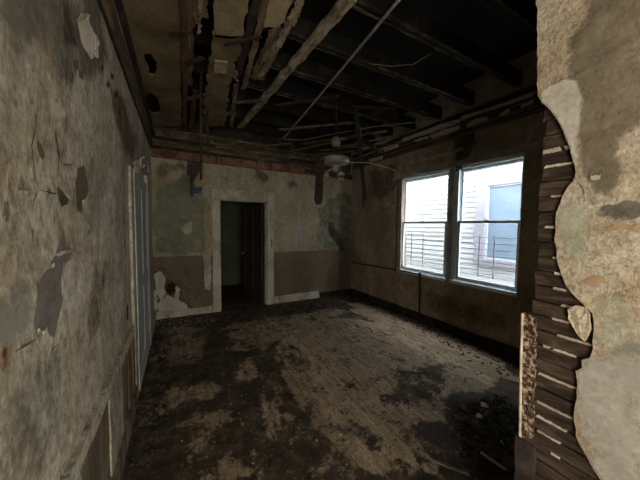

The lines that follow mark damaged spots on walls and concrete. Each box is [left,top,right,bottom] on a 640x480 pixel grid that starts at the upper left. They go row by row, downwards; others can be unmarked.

flaking render [76,13,100,59]
crack [31,110,58,206]
crack [56,135,73,173]
flaking render [57,165,89,212]
leakage [595,201,640,231]
flaking render [35,233,75,337]
flaking render [150,84,600,480]